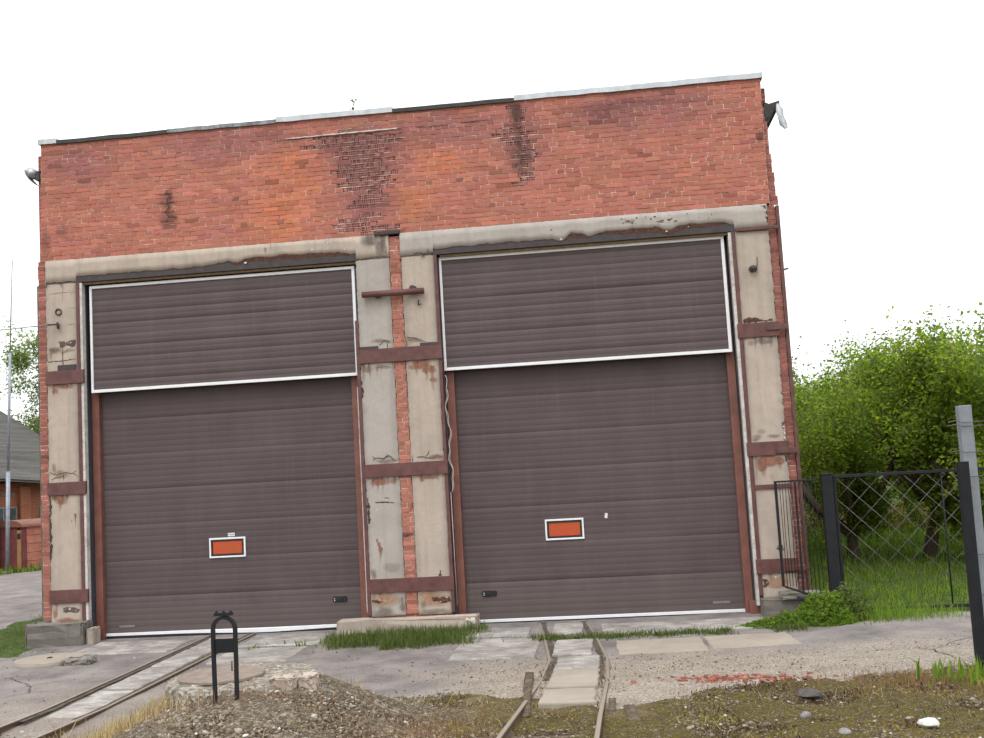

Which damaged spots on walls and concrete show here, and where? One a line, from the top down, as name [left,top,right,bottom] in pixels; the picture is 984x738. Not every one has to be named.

spalling [551,210,726,240]
spalling [228,249,350,265]
rust [410,360,436,381]
rust [758,456,783,471]